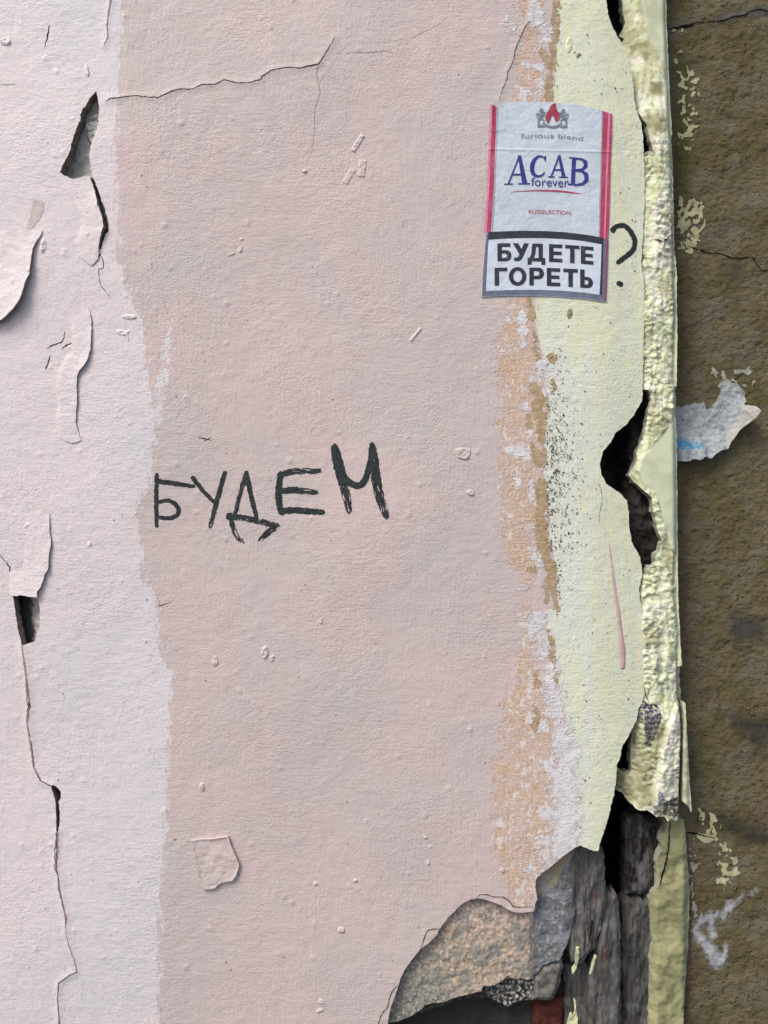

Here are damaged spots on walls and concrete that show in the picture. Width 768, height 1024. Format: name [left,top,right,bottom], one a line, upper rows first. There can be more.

crack [106,36,393,152]
peeling [66,100,109,265]
peeling [0,200,44,322]
peeling [55,308,92,443]
peeling [9,509,52,643]
crack [21,646,61,798]
flaking render [378,297,584,1024]
spalling [653,792,679,818]
crack [54,833,77,1024]